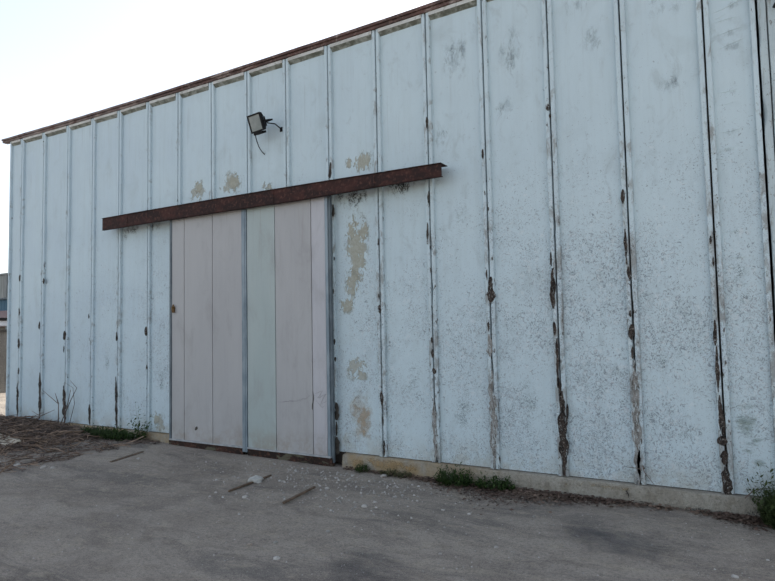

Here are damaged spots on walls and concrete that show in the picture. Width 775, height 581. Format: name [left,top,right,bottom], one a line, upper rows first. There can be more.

peeling [346,153,371,171]
peeling [191,181,204,200]
peeling [223,174,239,193]
peeling [341,216,368,312]
peeling [347,357,367,380]